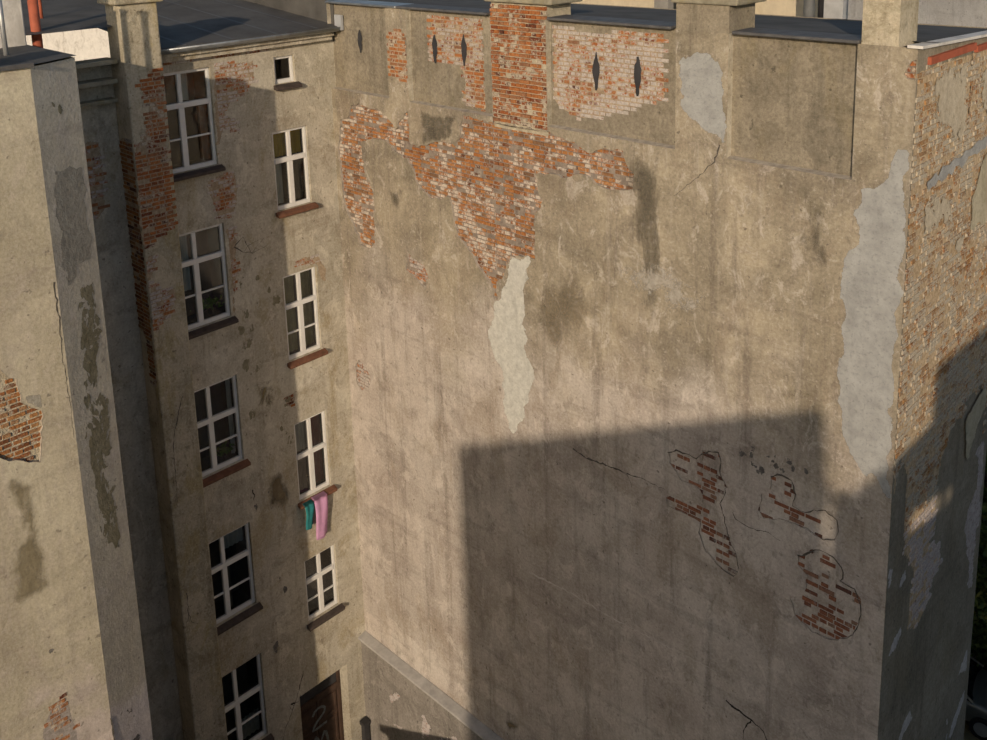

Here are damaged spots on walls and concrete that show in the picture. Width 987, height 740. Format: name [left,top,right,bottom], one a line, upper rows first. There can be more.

spalling [552,25,669,121]
spalling [119,48,271,387]
spalling [338,15,634,312]
crack [674,145,720,196]
flaking render [893,52,987,589]
spalling [0,369,44,463]
peeling [78,282,121,548]
crack [573,448,664,489]
spalling [666,450,741,577]
spalling [739,444,862,640]
spalling [43,693,80,740]